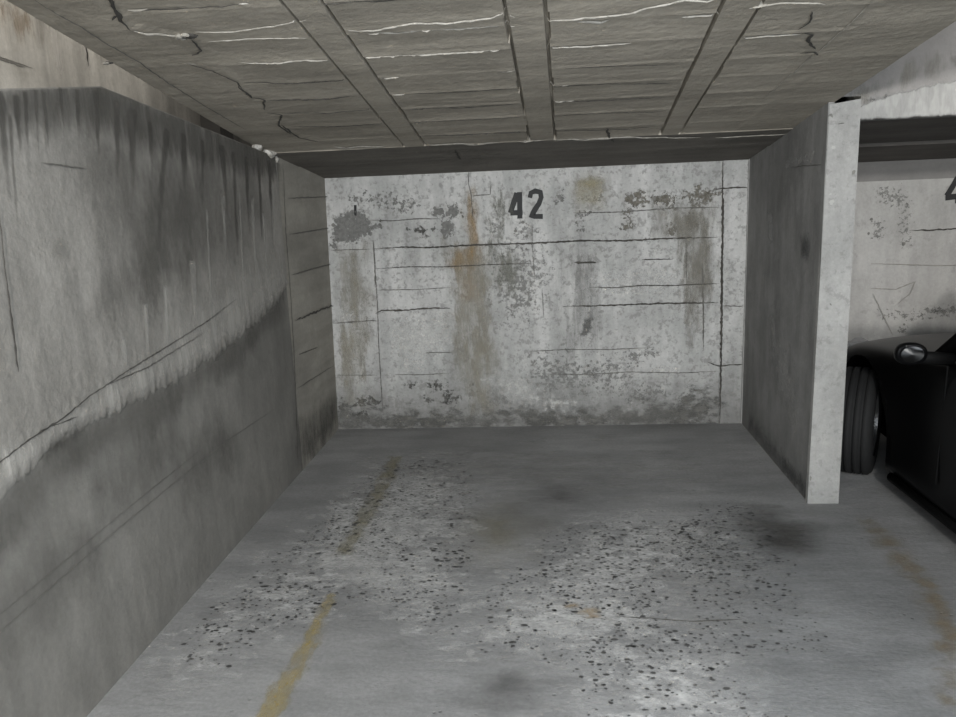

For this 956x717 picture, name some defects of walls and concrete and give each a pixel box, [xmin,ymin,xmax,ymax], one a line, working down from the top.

leakage [0,88,277,239]
crack [35,0,244,129]
crack [189,40,382,142]
crack [0,223,19,372]
crack [0,300,235,463]
leakage [338,368,717,429]